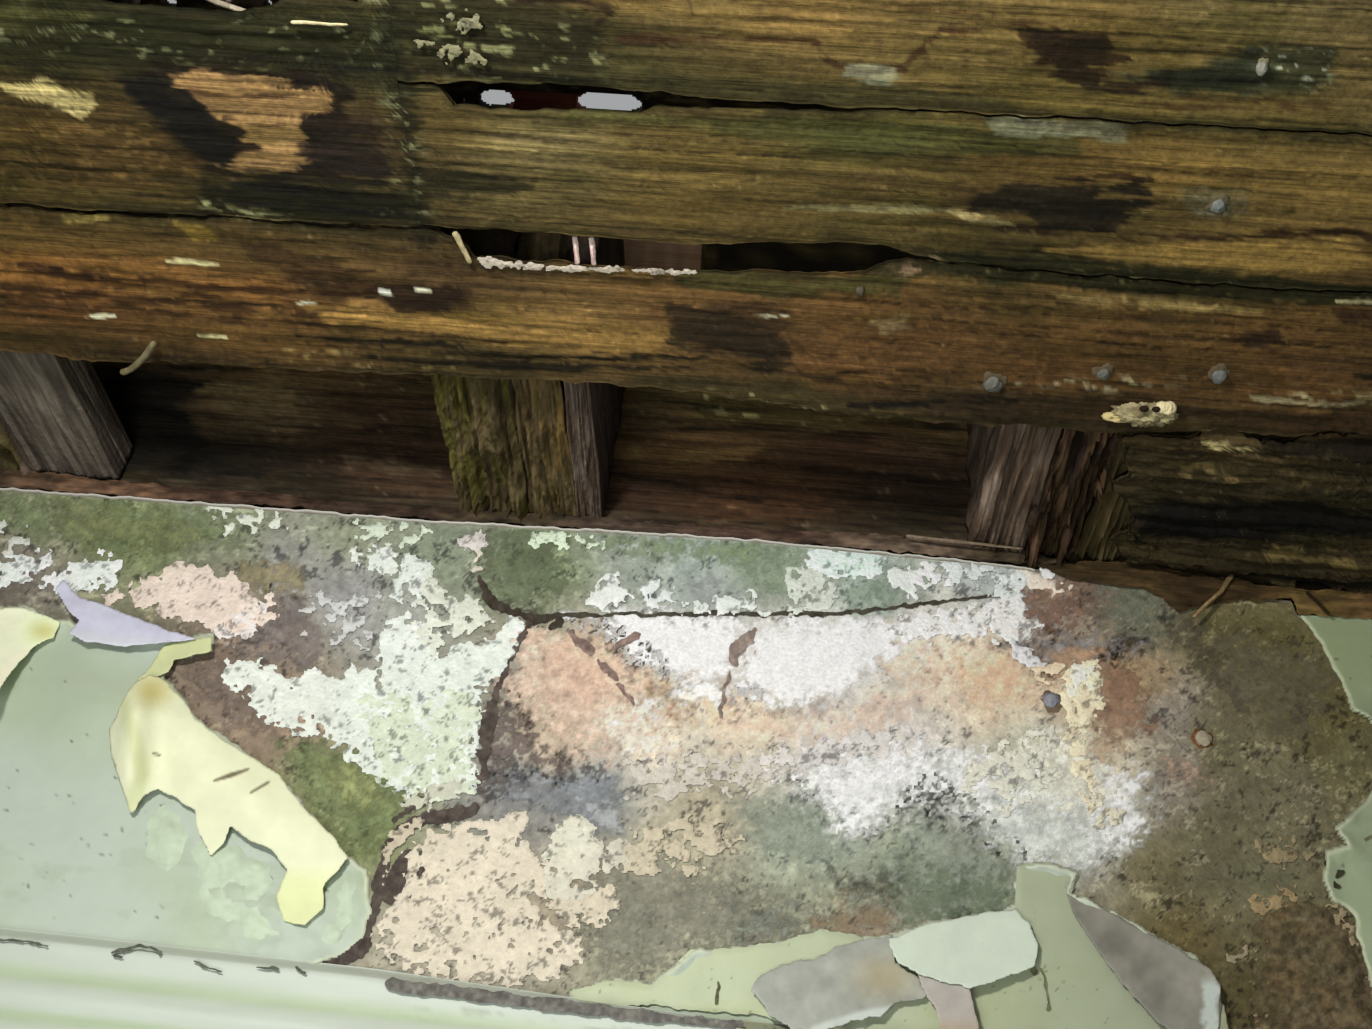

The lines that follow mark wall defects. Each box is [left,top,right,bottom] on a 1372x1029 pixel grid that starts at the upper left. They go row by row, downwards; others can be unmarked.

leakage [0,497,1153,928]
crack [256,575,1000,974]
peeling [0,491,1372,1029]
leakage [1161,606,1331,738]
crack [0,939,48,947]
crack [111,944,222,973]
leakage [580,851,826,979]
crack [1324,860,1345,889]